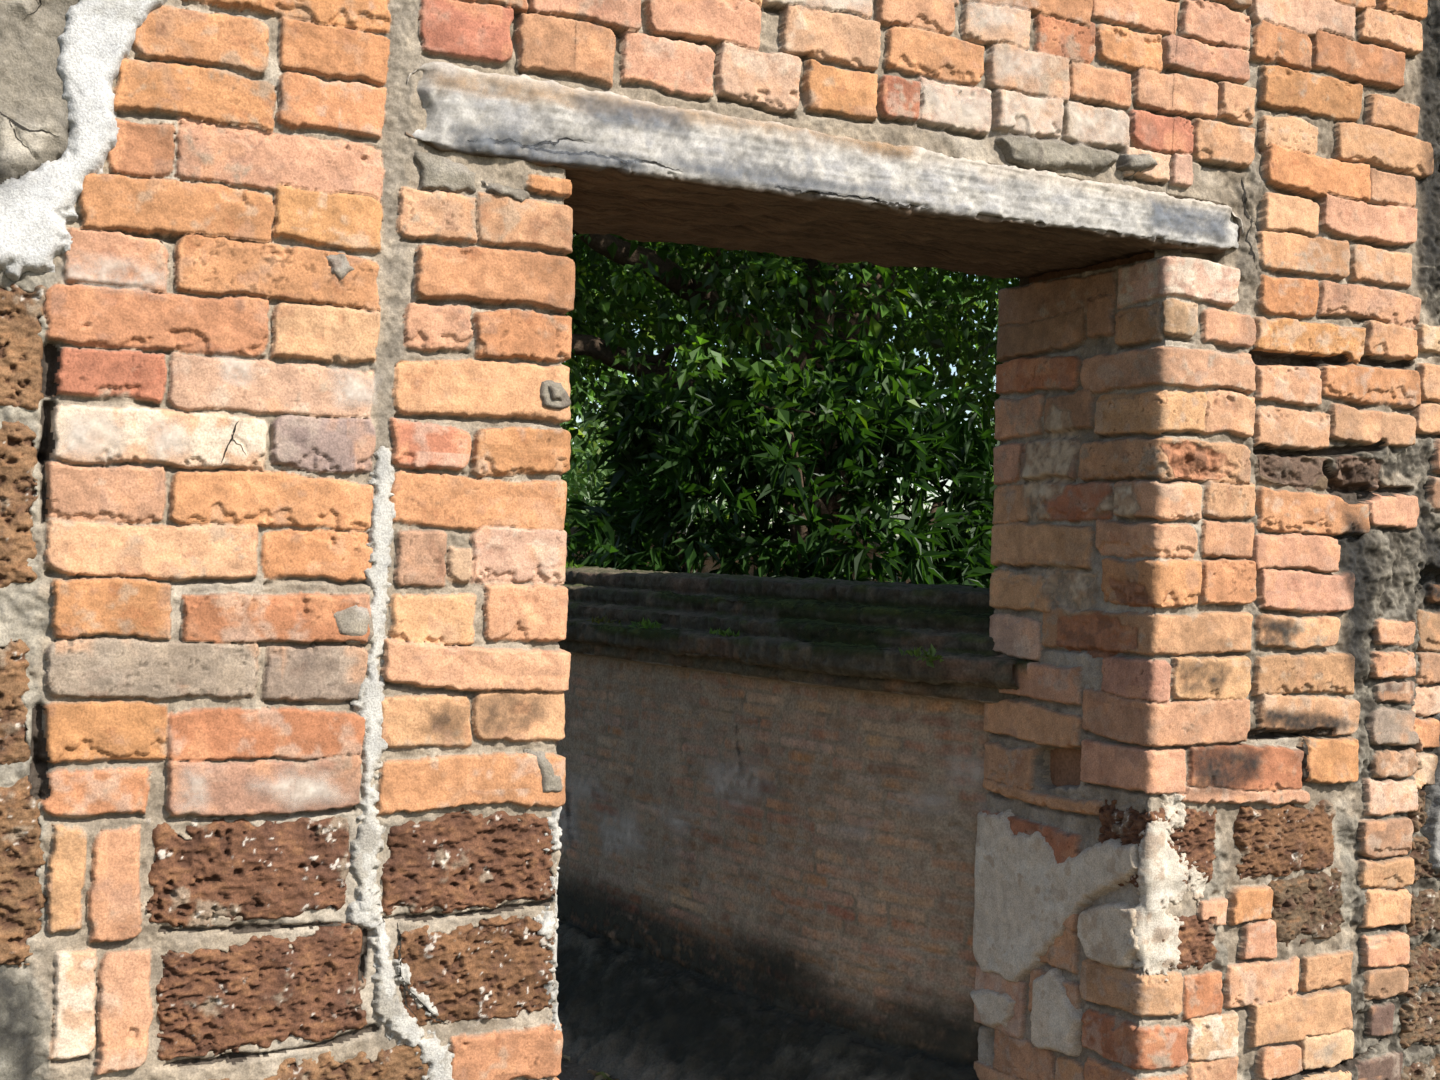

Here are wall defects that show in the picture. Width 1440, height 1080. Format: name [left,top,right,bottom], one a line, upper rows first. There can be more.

crack [0,112,59,154]
flaking render [0,0,79,281]
crack [221,421,246,463]
leakage [510,806,983,1080]
flaking render [970,792,1209,1057]